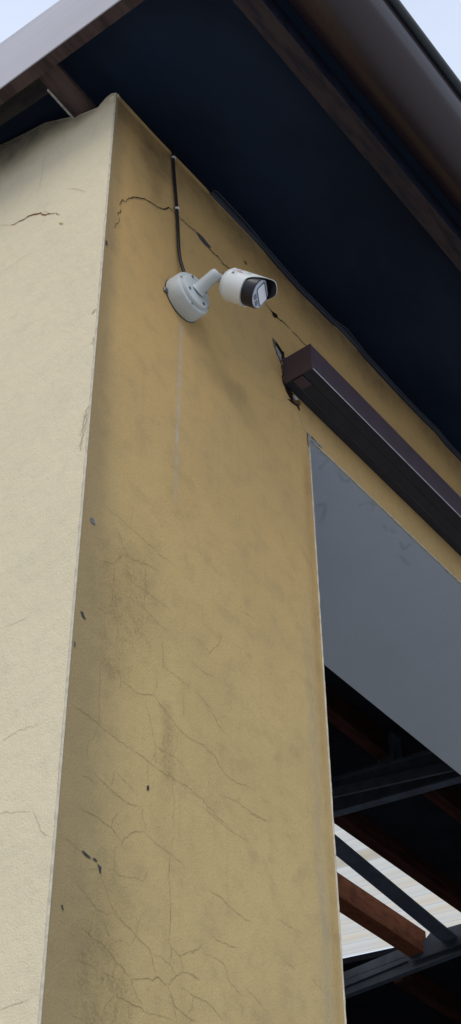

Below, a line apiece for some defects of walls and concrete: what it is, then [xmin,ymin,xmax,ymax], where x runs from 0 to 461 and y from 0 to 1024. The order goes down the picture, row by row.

crack [115,197,230,269]
crack [268,306,307,346]
flaking render [272,337,301,410]
crack [4,635,268,1023]